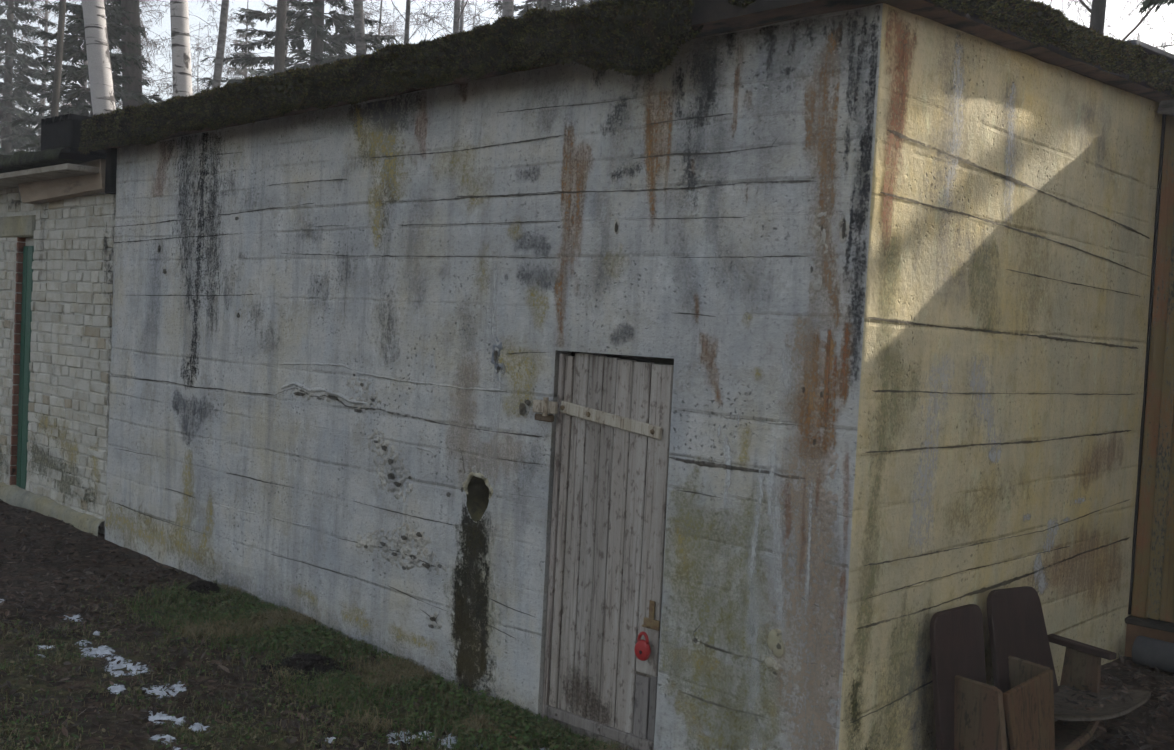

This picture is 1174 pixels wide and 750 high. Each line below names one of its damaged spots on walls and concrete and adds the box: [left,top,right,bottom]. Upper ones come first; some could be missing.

corrosion [554,126,590,346]
corrosion [643,87,674,225]
water stain [755,6,880,384]
corrosion [797,32,852,460]
water stain [106,133,244,587]
crack [113,376,543,472]
spalling [367,429,413,503]
spalling [355,522,447,575]
water stain [452,504,495,700]